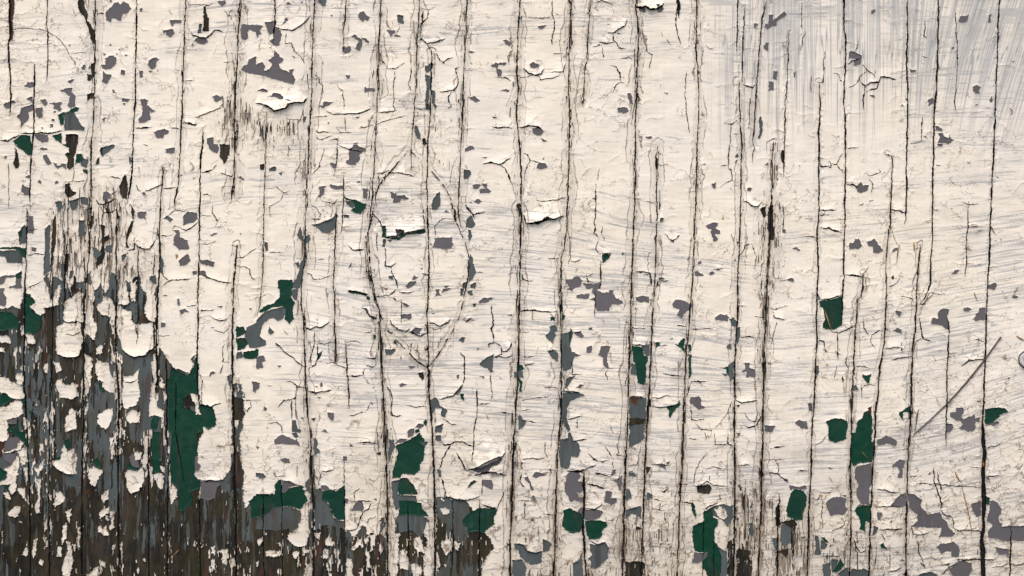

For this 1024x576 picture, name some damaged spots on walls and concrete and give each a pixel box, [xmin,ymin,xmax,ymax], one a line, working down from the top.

peeling [240,1,309,112]
peeling [0,211,231,576]
crack [8,0,492,576]
peeling [211,181,368,369]
peeling [256,503,335,576]
peeling [345,498,460,576]
peeling [313,375,508,515]
peeling [508,300,705,576]
crack [488,0,960,576]
peeling [818,288,853,333]
peeling [826,406,1024,576]
crack [965,0,1012,576]